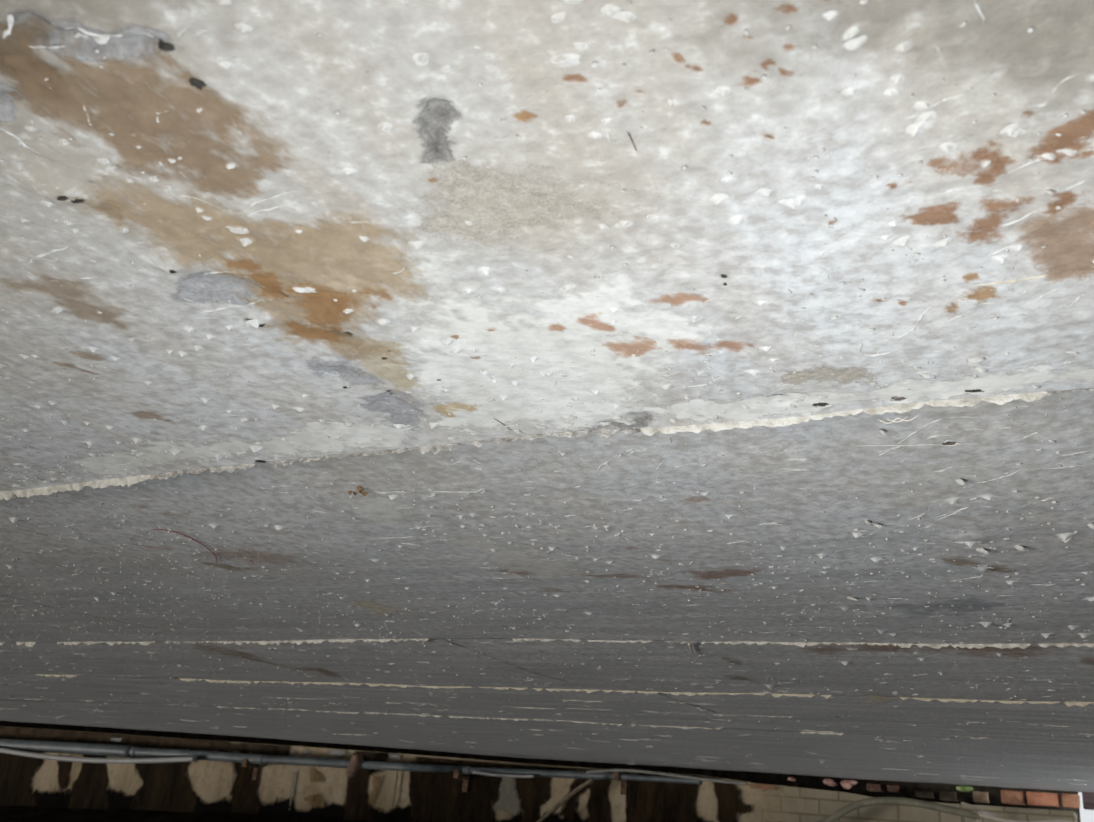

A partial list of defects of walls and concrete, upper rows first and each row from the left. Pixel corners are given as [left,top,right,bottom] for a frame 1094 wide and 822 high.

rust [1029,111,1094,164]
rust [929,142,1015,186]
damp [0,19,1094,429]
rust [904,198,1034,243]
rust [1023,192,1094,280]
rust [224,259,391,342]
rust [656,294,708,305]
rust [963,273,999,300]
rust [579,314,753,356]